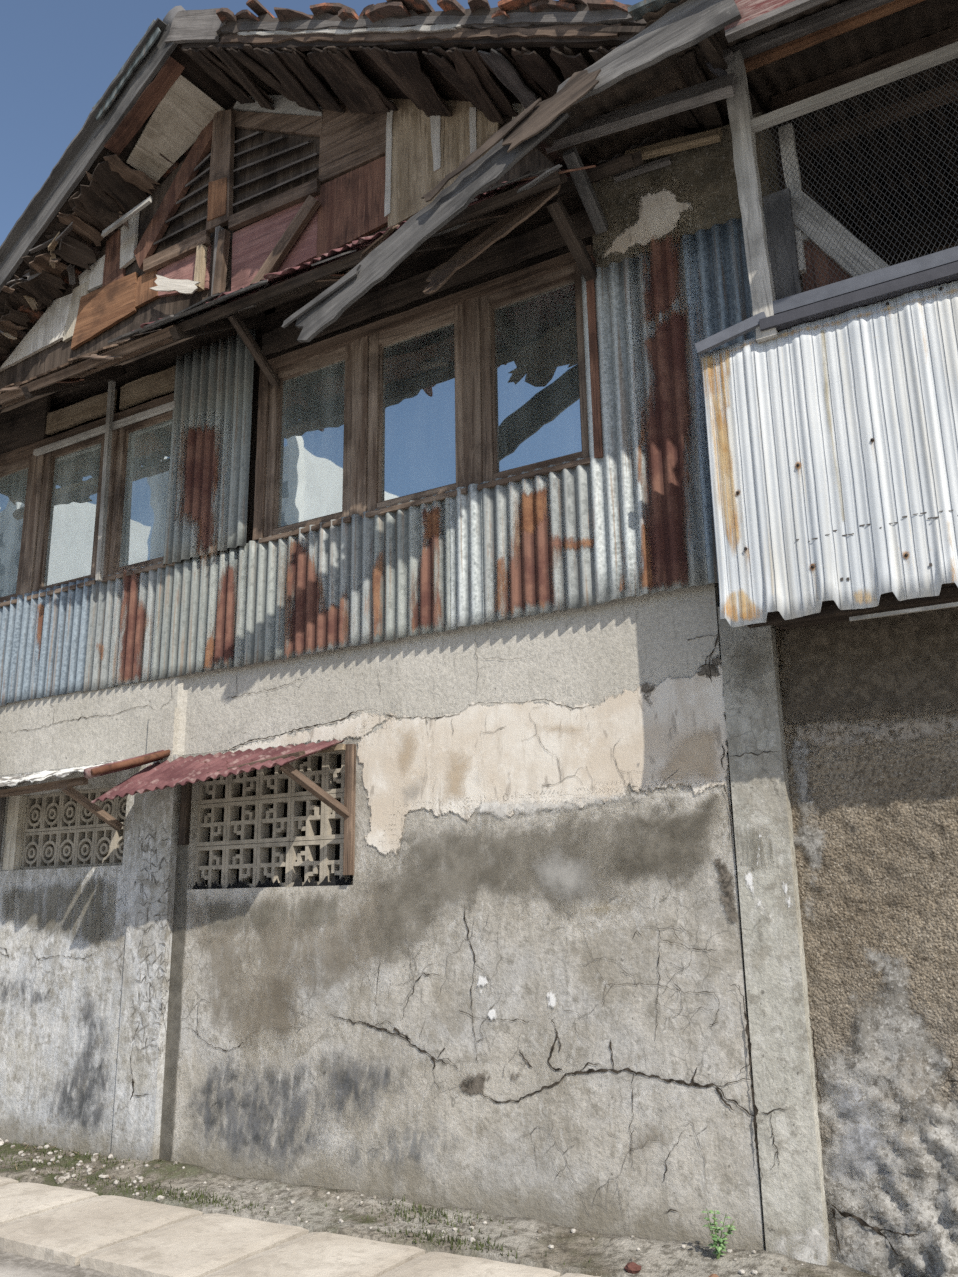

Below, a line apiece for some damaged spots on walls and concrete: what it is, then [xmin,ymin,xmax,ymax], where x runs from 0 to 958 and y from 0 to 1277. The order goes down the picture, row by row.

peeling [601,188,693,257]
corrosion [638,236,747,590]
corrosion [495,489,594,613]
corrosion [119,570,146,681]
corrosion [204,565,236,667]
crack [10,685,172,733]
crack [222,626,677,827]
peeling [223,656,729,856]
damp [4,881,114,943]
damp [58,1000,107,1127]
crack [1,825,783,1231]
damp [159,802,711,1160]